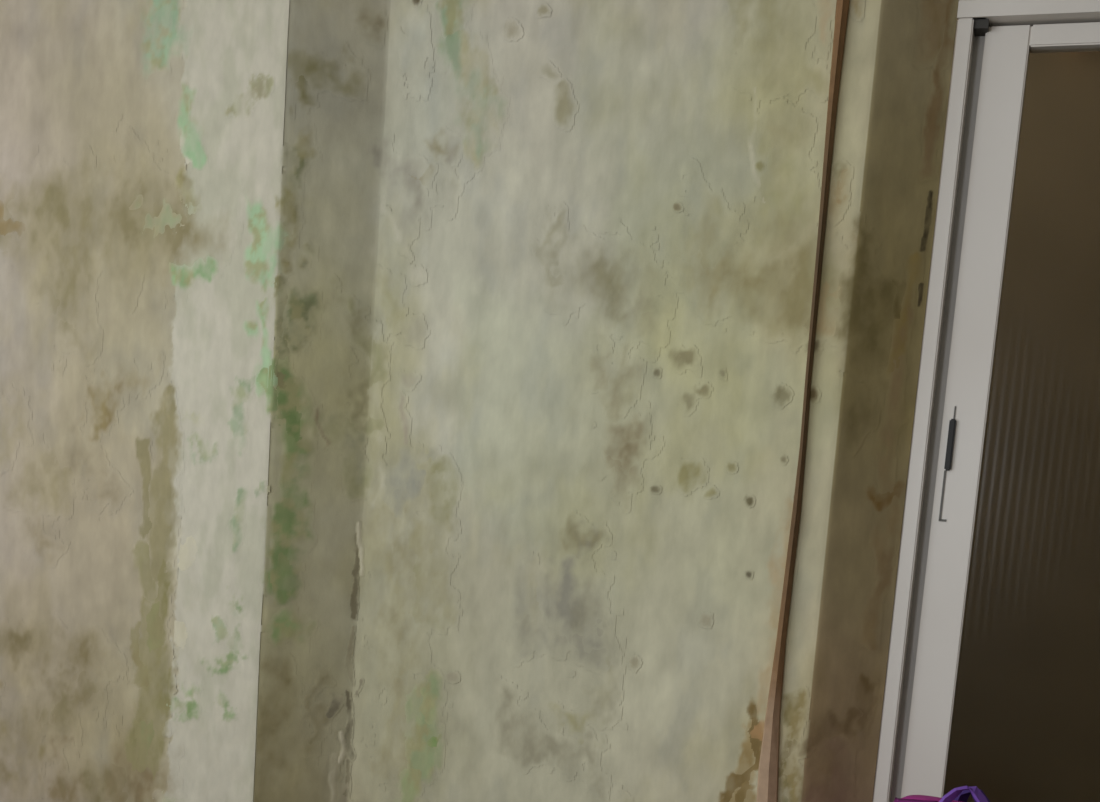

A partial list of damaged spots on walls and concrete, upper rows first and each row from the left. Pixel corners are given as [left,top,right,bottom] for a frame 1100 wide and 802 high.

damp [0,113,244,802]
peeling [129,0,325,802]
crack [325,533,364,799]
peeling [410,0,510,173]
damp [528,0,907,514]
damp [794,671,880,802]